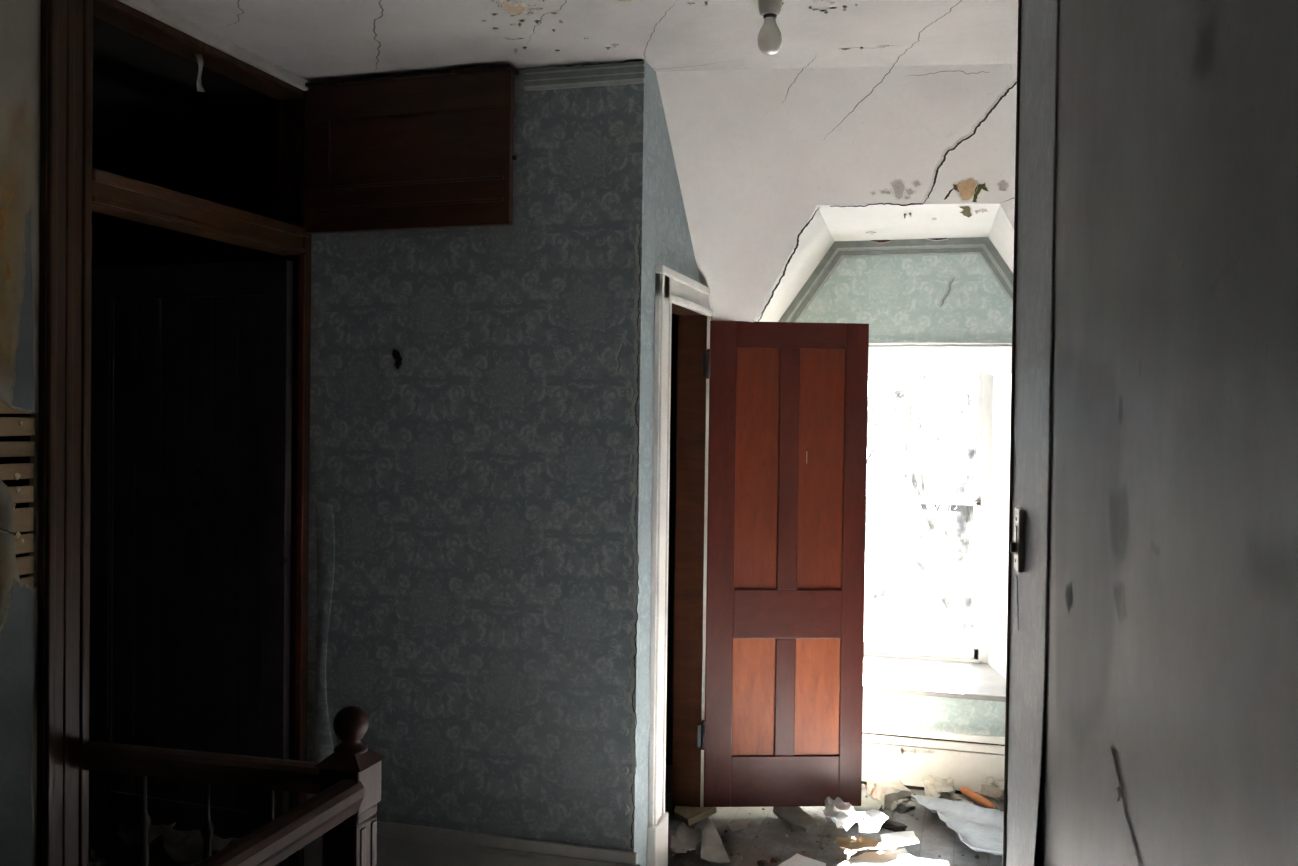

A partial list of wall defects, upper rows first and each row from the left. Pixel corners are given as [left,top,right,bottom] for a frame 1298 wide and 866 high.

crack [373,0,384,72]
crack [757,0,1017,324]
peeling [870,179,922,201]
peeling [997,180,1009,191]
flaking render [0,200,37,866]